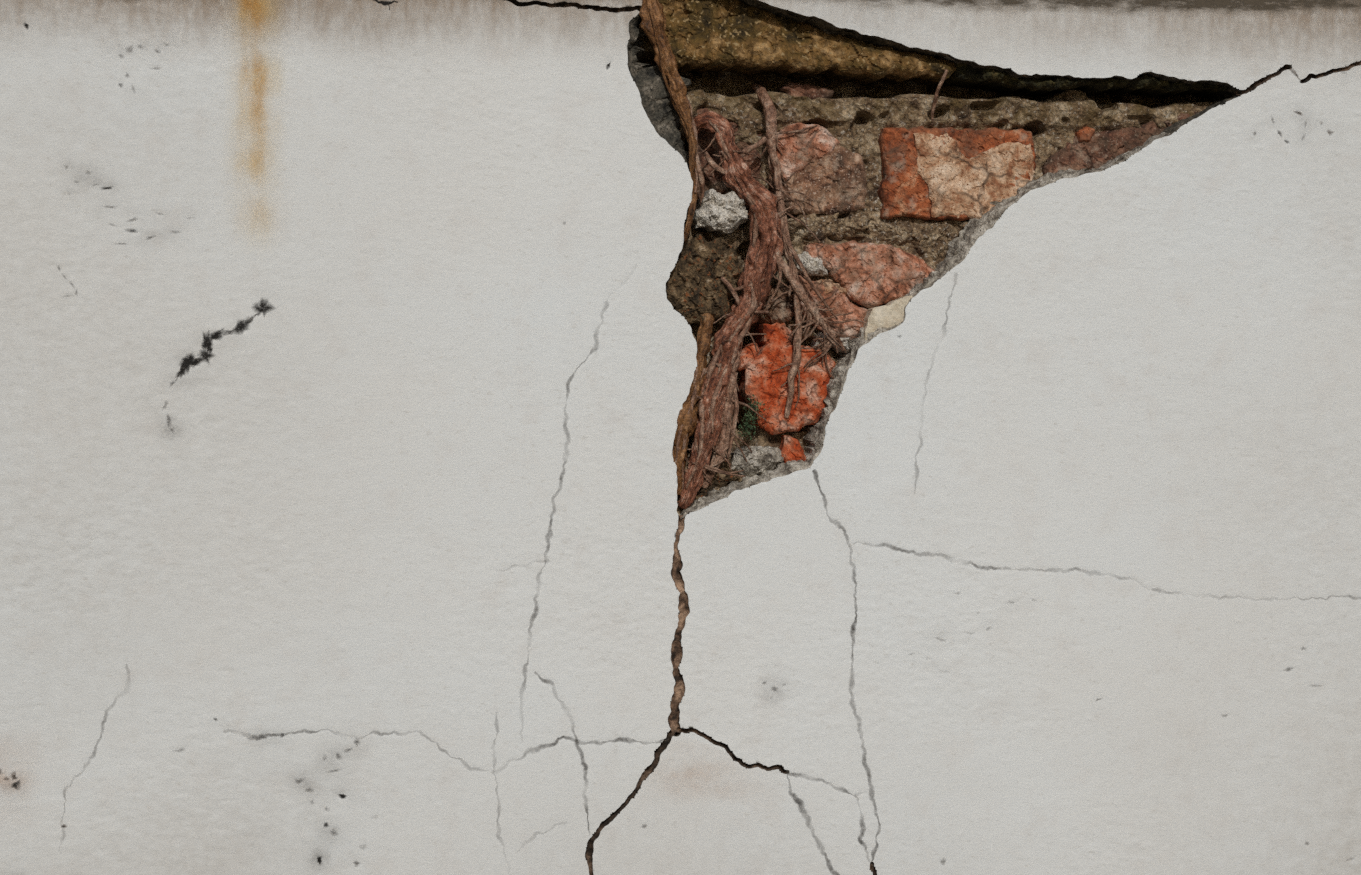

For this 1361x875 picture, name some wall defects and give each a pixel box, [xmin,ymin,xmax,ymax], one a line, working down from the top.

crack [375,0,398,10]
crack [506,0,640,13]
crack [1235,61,1361,95]
spalling [627,0,1242,530]
crack [585,515,802,875]
crack [858,820,879,875]